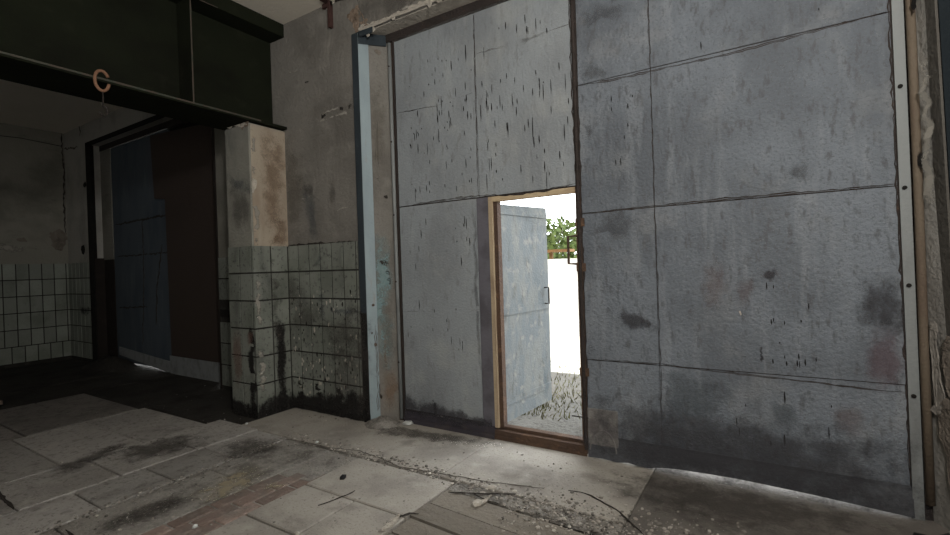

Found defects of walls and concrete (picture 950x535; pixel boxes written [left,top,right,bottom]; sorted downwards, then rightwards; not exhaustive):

spalling [347,0,442,37]